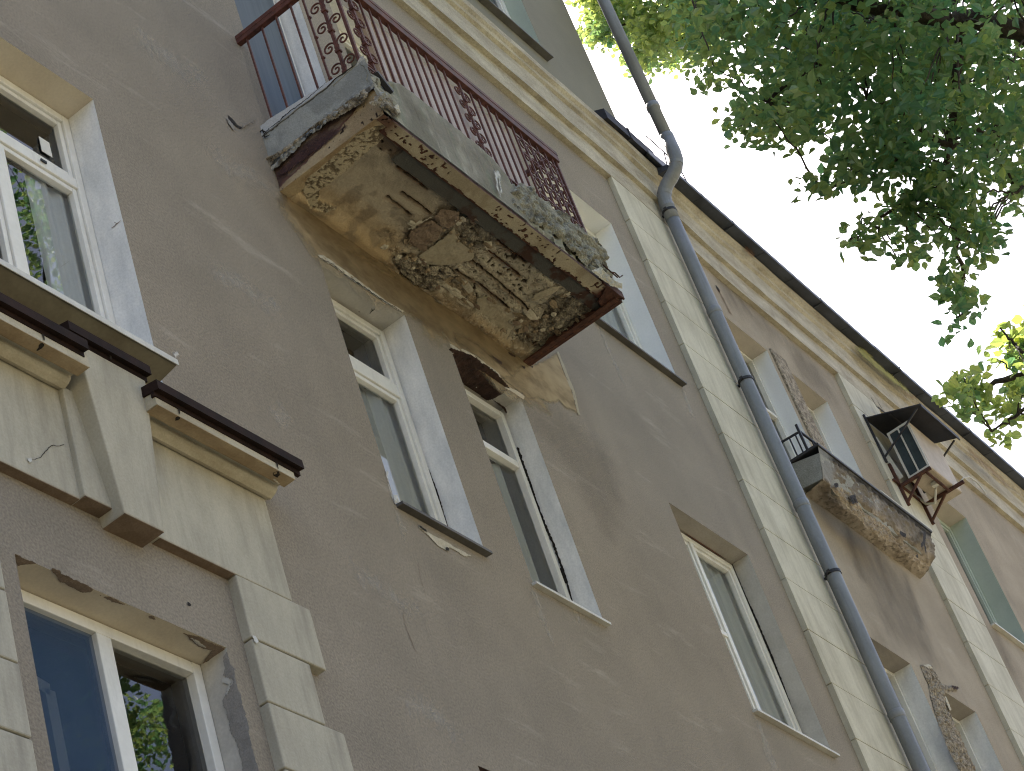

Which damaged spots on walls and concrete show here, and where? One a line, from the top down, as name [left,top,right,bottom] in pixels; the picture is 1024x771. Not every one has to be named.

spalling [266,89,401,166]
spalling [510,183,622,289]
flaking render [379,216,589,415]
peeling [51,568,125,605]
flaking render [419,526,471,557]
spalling [830,483,906,541]
peeling [183,633,259,771]
flaking render [920,664,976,771]